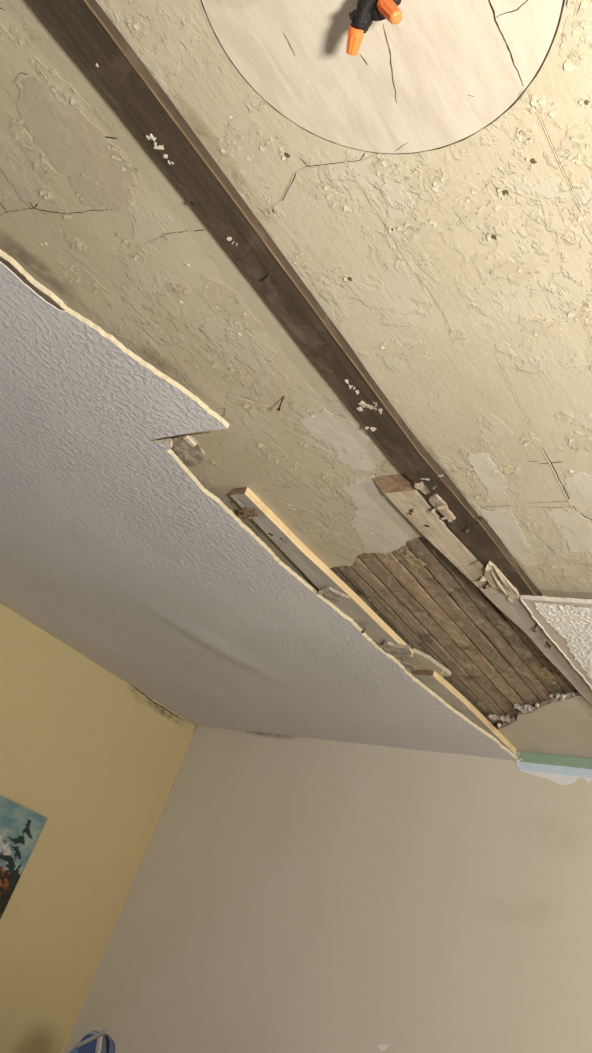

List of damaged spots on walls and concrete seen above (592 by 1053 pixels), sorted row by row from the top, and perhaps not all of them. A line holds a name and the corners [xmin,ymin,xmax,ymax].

crack [488,0,592,233]
crack [0,202,108,217]
crack [262,143,451,333]
peeling [300,409,418,565]
peeling [467,453,535,568]
peeling [544,470,592,553]
flaking render [487,703,536,722]